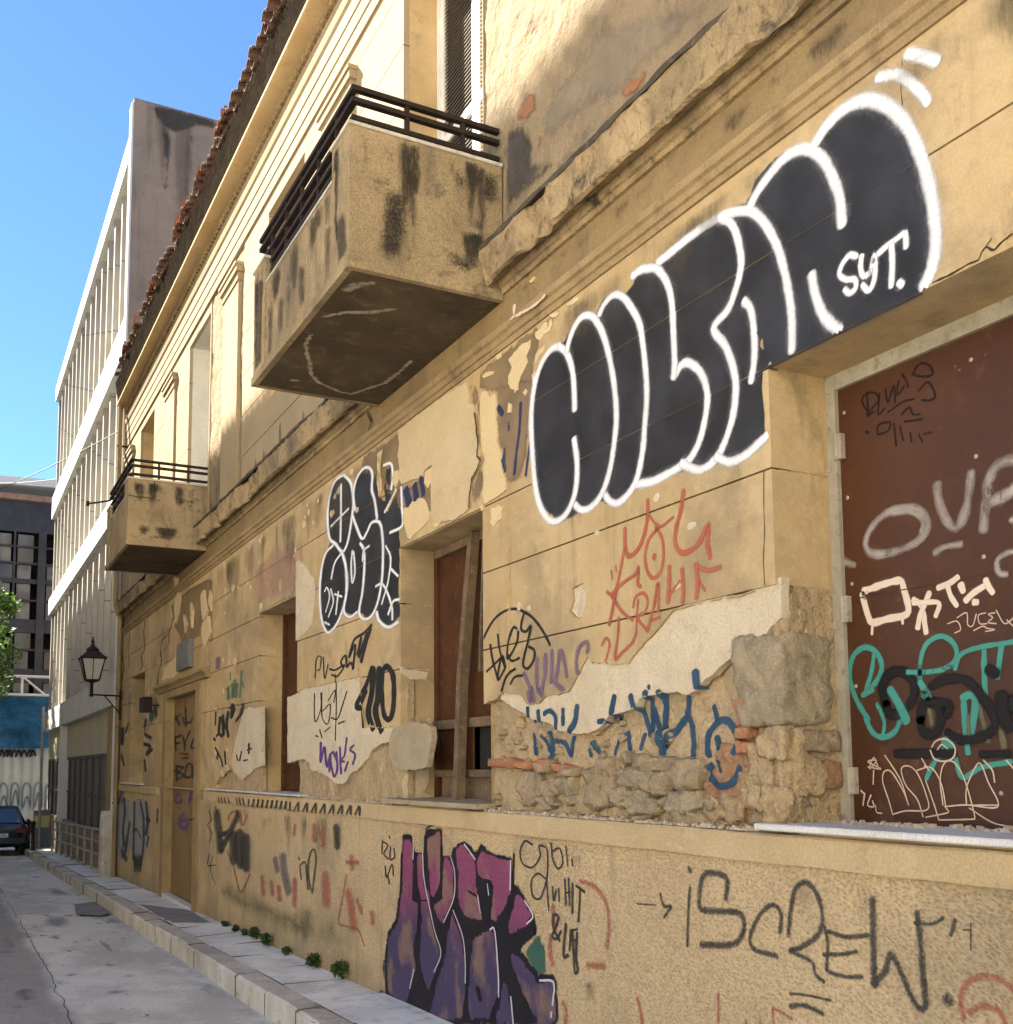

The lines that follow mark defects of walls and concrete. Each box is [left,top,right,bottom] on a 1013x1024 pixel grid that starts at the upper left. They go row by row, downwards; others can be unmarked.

leakage [155,108,214,166]
leakage [310,152,345,274]
leakage [382,145,419,255]
leakage [254,245,303,369]
leakage [304,335,413,395]
leakage [322,308,396,317]
flaking render [350,294,580,539]
flaking render [174,577,252,649]
flaking render [162,657,180,681]
flaking render [212,707,267,791]
flaking render [287,665,437,801]
flaking render [488,577,843,826]